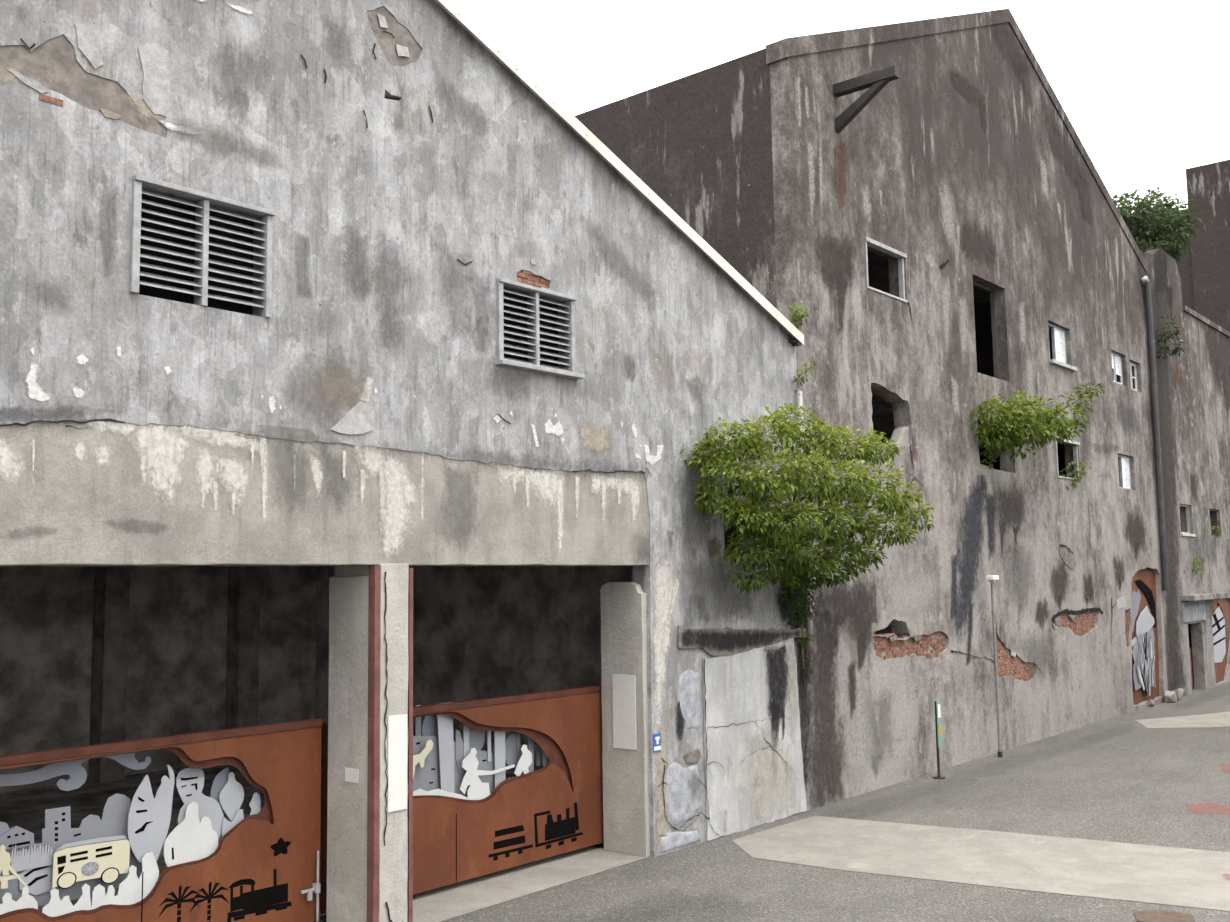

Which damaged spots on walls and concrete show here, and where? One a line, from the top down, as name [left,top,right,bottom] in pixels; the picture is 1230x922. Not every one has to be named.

peeling [367,6,422,67]
peeling [0,24,203,138]
flaking render [517,259,549,289]
peeling [26,348,49,401]
crack [0,419,125,429]
peeling [330,378,378,435]
damp [75,420,267,521]
damp [293,455,322,492]
damp [342,446,424,557]
damp [931,472,1025,663]
flaking render [872,625,947,660]
damp [653,560,937,851]